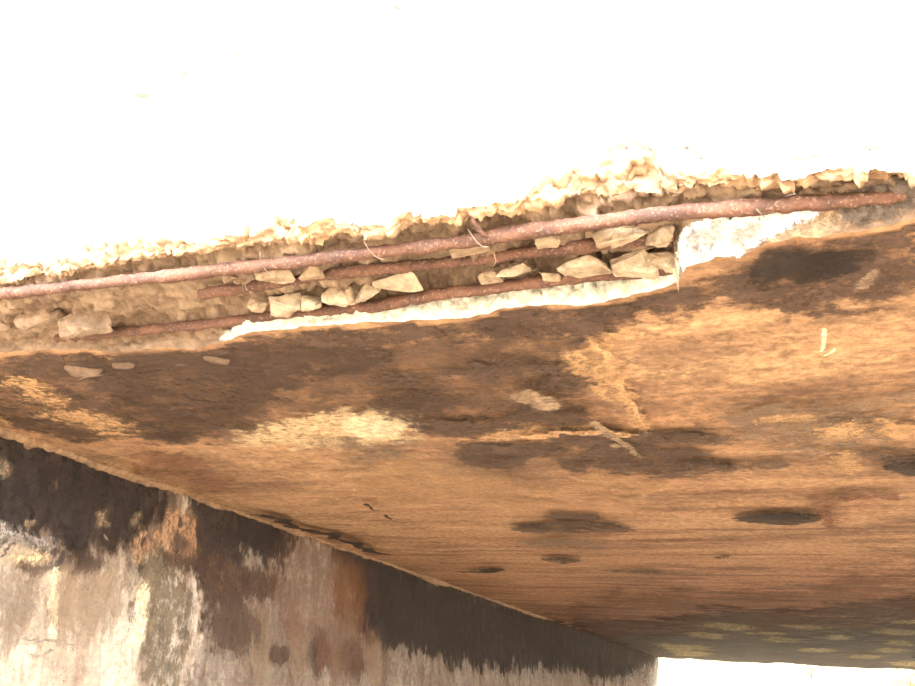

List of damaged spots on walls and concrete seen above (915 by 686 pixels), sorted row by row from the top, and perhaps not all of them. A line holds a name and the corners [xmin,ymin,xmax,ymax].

spalling [0,149,915,380]
water stain [0,208,915,480]
water stain [0,437,298,668]
water stain [511,513,634,564]
water stain [306,544,915,684]
water stain [730,512,824,525]